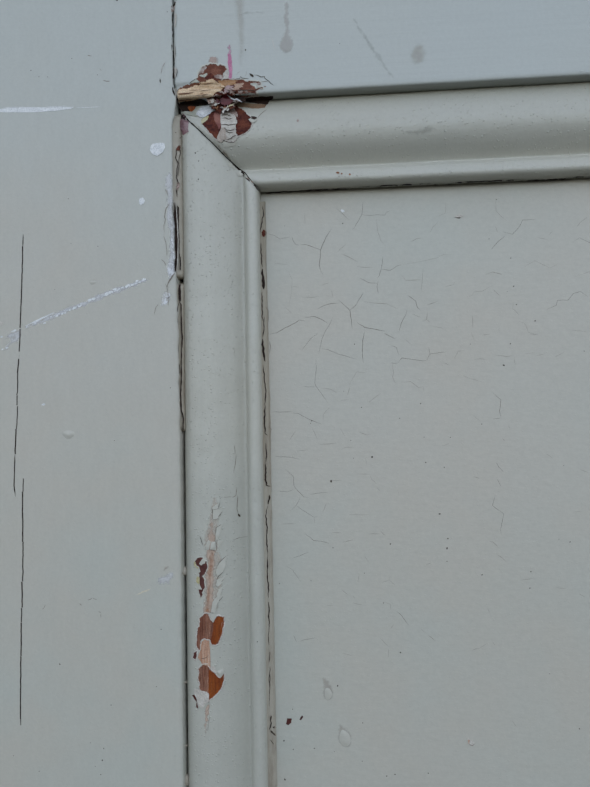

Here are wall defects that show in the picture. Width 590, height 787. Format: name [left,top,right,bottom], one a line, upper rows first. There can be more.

peeling [177,70,273,148]
crack [13,237,24,725]
crack [154,145,184,433]
peeling [192,501,226,725]
crack [171,2,590,743]